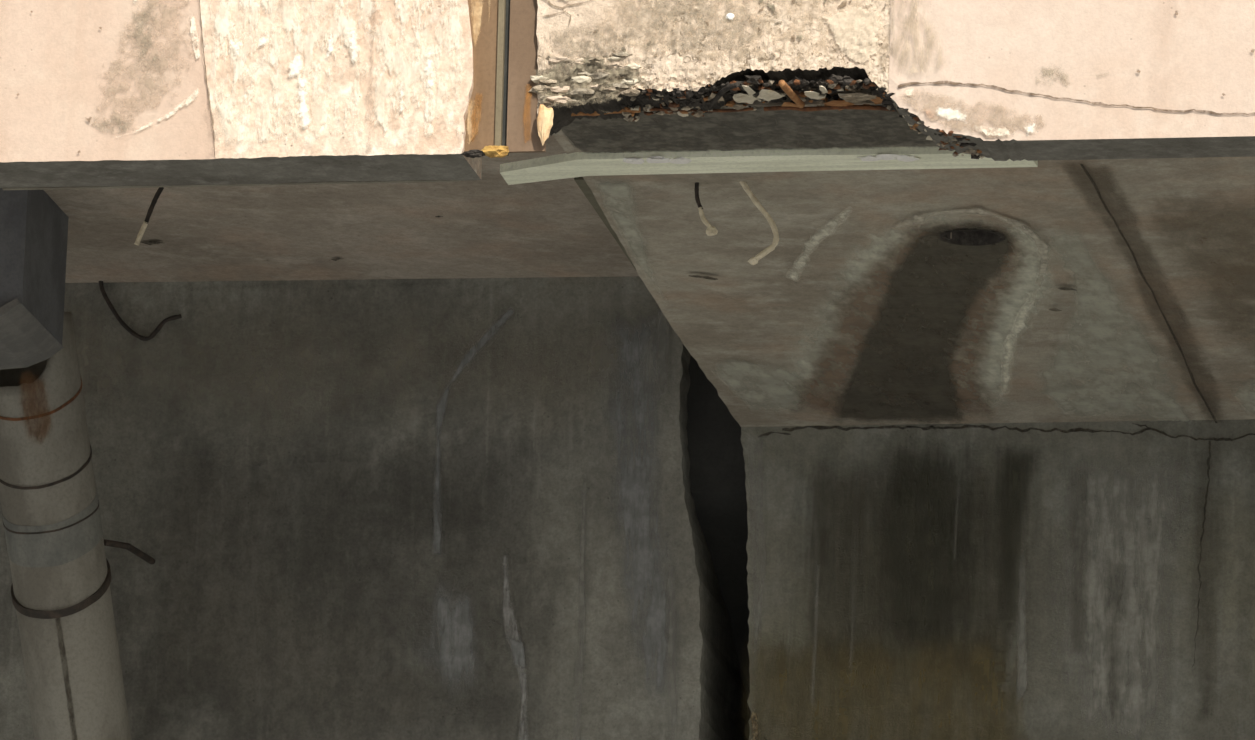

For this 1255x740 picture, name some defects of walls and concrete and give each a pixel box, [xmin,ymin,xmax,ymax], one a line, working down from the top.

crack [541,0,591,27]
spalling [528,0,1043,159]
crack [898,81,1255,115]
damp [721,209,1186,422]
crack [759,423,1255,441]
damp [755,453,1028,740]
damp [1067,466,1177,736]